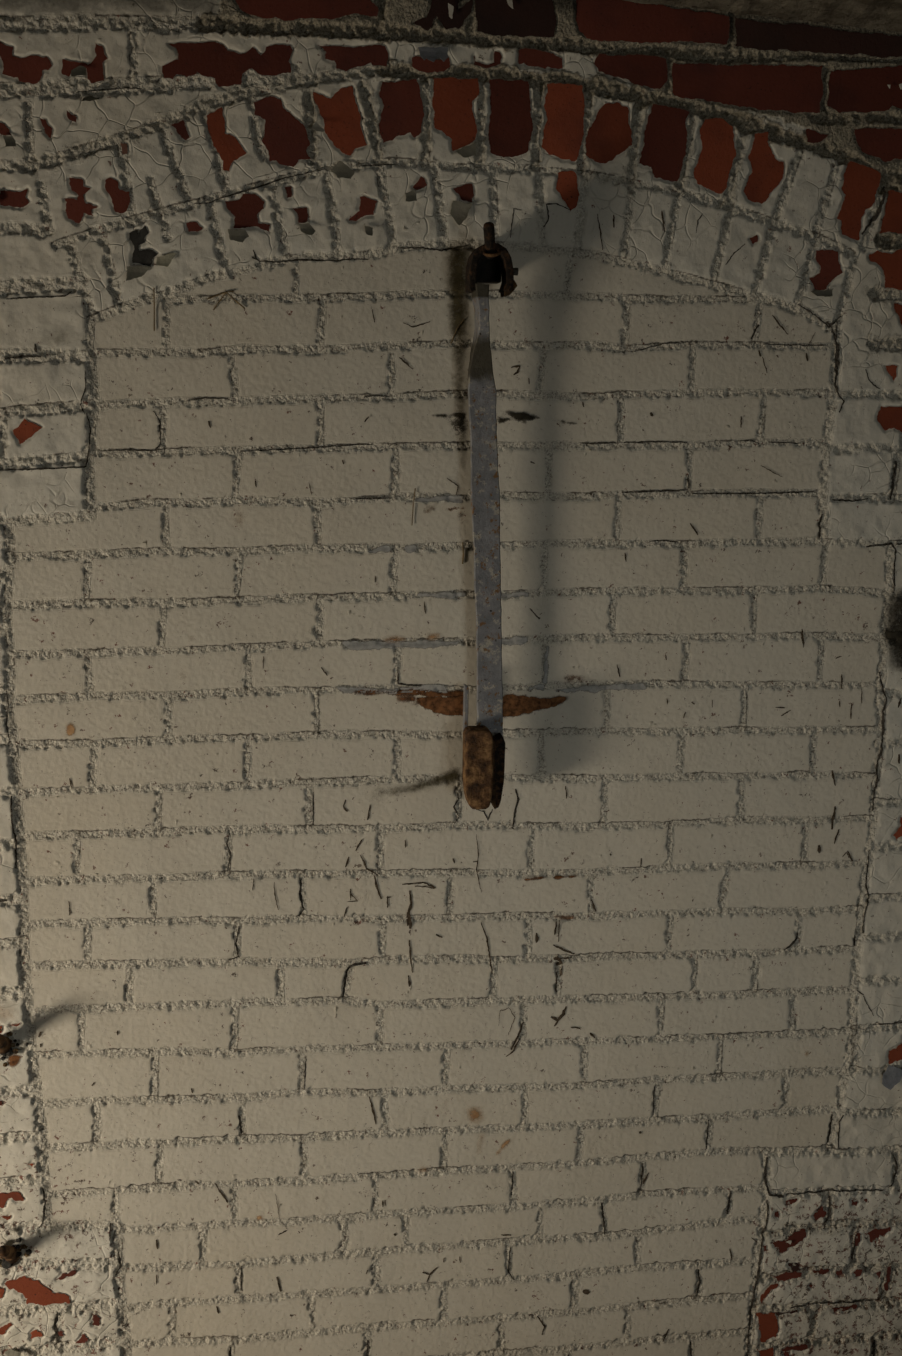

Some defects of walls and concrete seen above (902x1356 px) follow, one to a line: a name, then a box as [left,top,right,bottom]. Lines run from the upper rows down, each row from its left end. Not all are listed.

peeling [0,42,107,84]
peeling [162,42,293,87]
peeling [236,0,902,324]
corrosion [355,689,463,716]
corrosion [503,694,568,717]
crack [872,672,887,811]
crack [854,850,870,946]
corrosion [8,1055,21,1067]
crack [827,1114,844,1148]
peeling [0,1238,76,1306]
crack [747,1153,898,1356]
peeling [756,1206,891,1356]